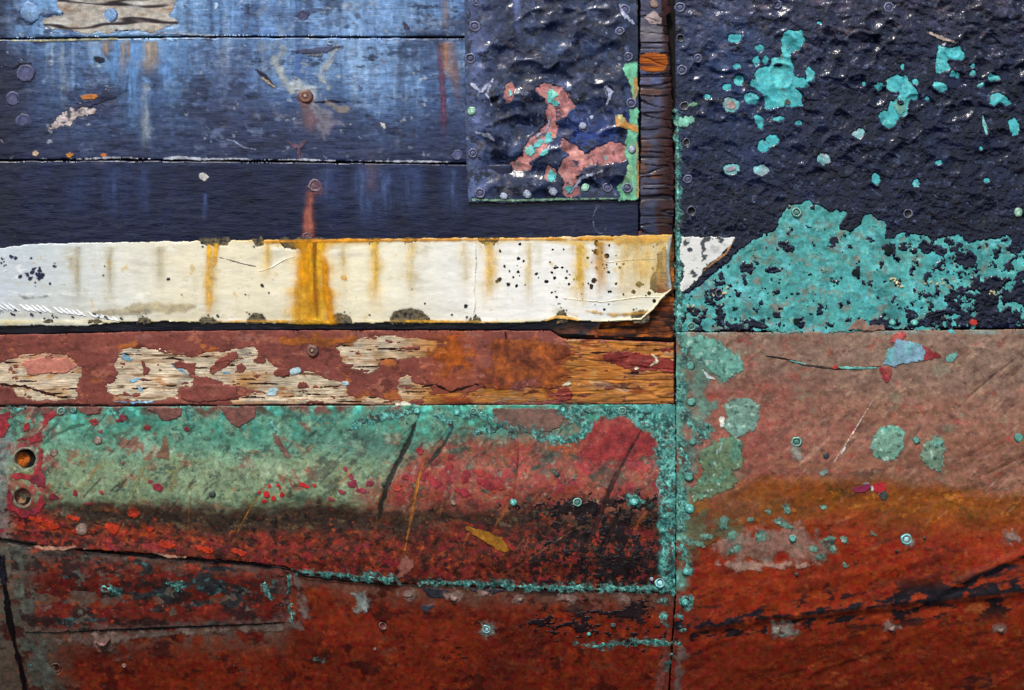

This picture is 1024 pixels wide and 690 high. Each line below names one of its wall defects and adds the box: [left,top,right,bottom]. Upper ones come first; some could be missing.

peeling [42,0,178,34]
peeling [471,62,639,201]
peeling [723,30,815,176]
rust [206,244,218,306]
rust [229,182,531,346]
peeling [106,200,1024,471]
rust [575,237,613,287]
rust [597,236,675,338]
rust [158,436,169,460]
peeling [391,454,506,502]
rust [465,526,509,552]
crack [0,537,384,690]